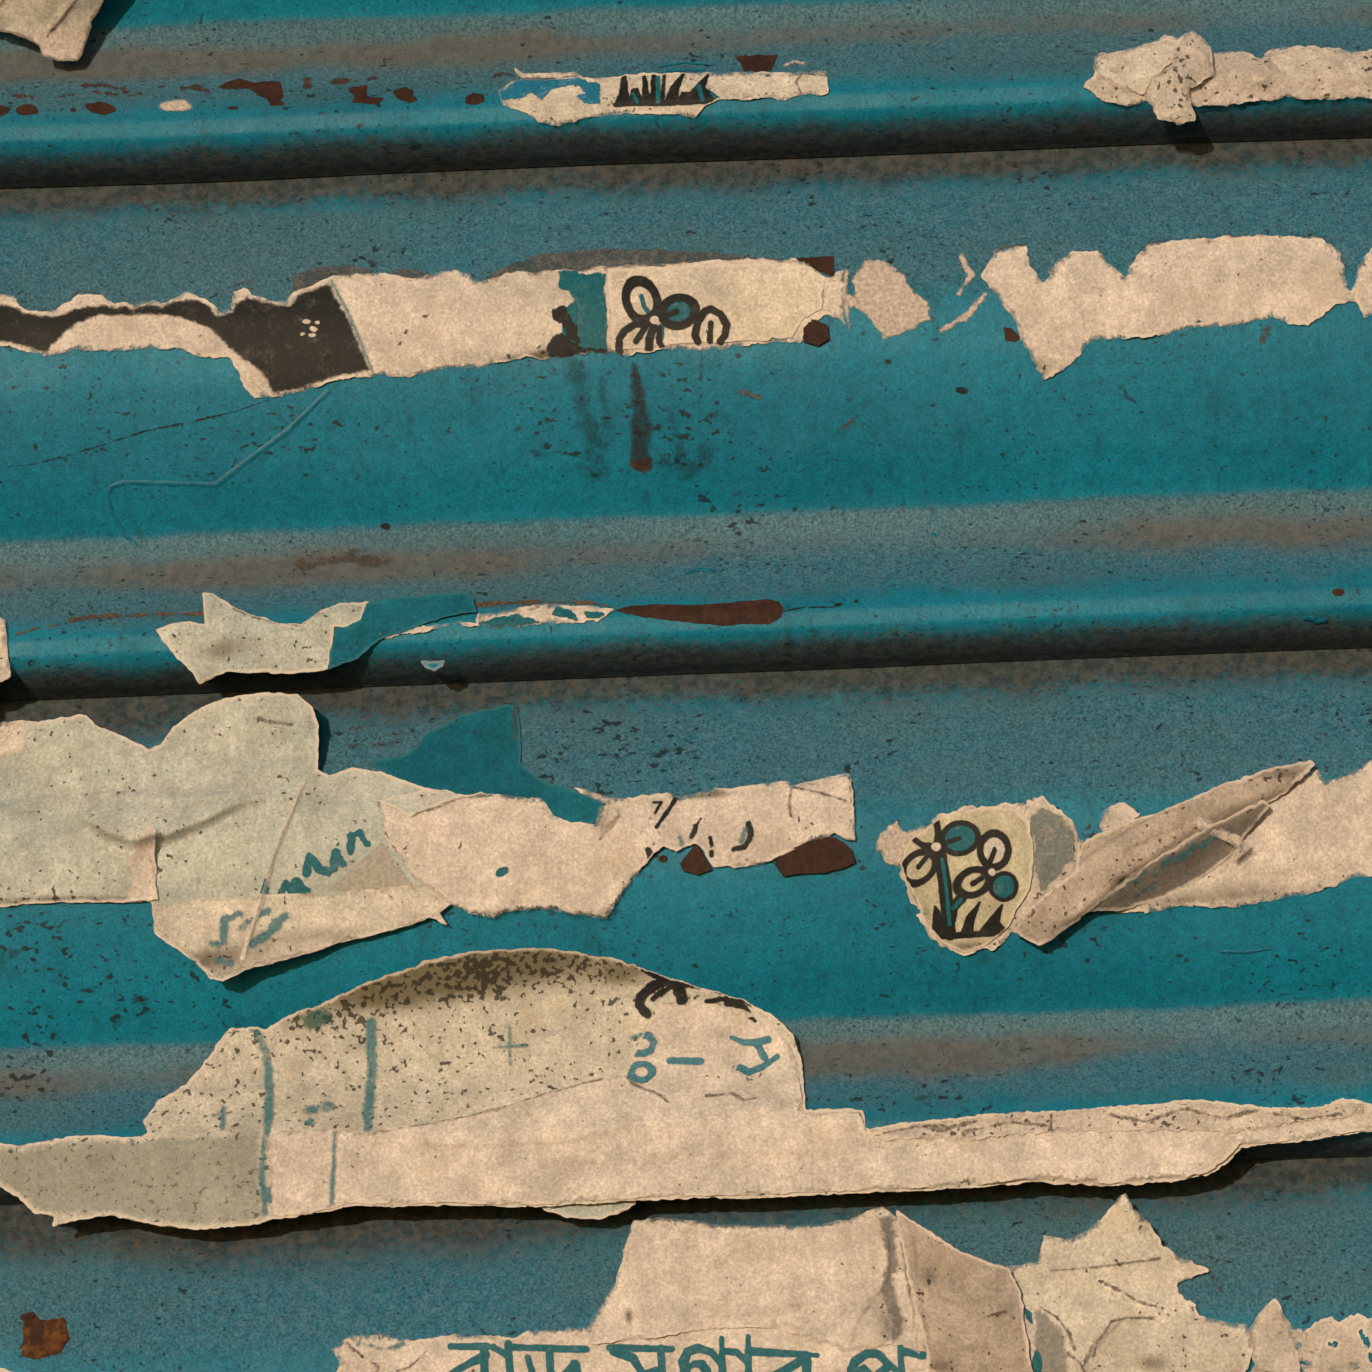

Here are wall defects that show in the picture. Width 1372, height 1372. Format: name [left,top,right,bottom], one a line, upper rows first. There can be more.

peeling [659,61,713,72]
corrosion [735,54,778,73]
corrosion [0,93,38,116]
corrosion [59,83,142,115]
corrosion [158,78,285,110]
corrosion [330,77,418,105]
corrosion [615,599,784,626]
corrosion [652,846,712,875]
corrosion [775,837,855,877]
corrosion [20,1312,70,1359]